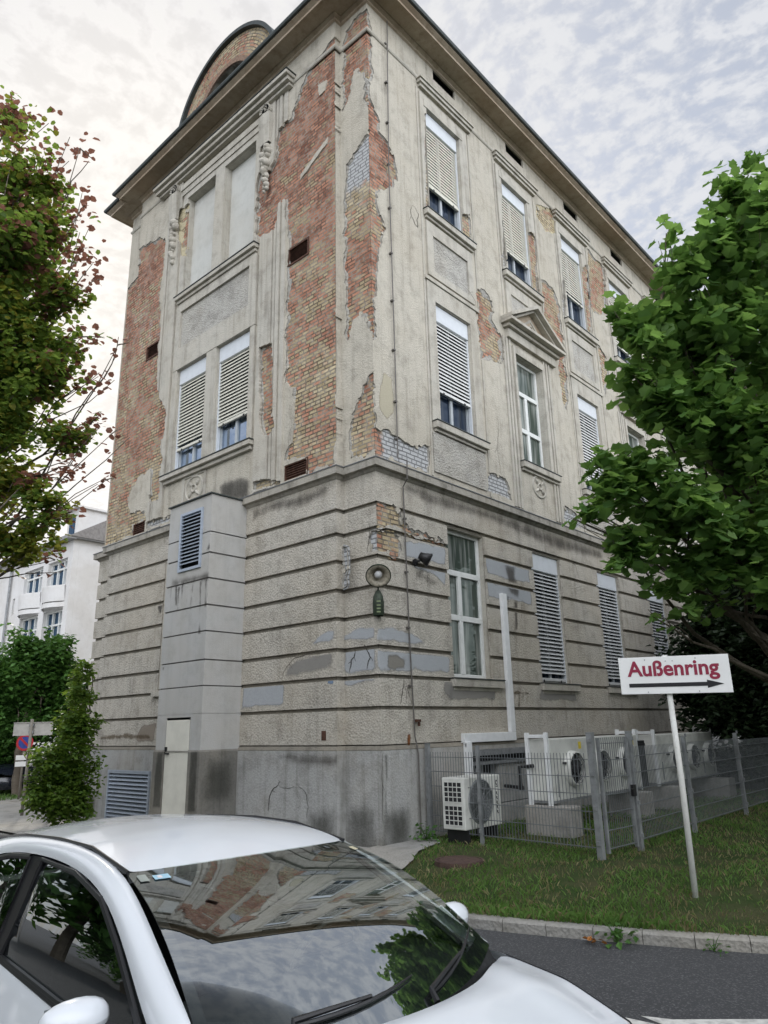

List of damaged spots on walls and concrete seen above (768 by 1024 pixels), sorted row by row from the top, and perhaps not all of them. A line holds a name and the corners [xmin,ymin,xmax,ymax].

peeling [256,9,398,474]
peeling [476,289,504,364]
peeling [528,205,568,409]
peeling [581,249,607,333]
peeling [106,237,170,545]
peeling [349,373,430,473]
peeling [488,473,511,500]
peeling [367,501,444,561]
leakage [188,753,197,811]
leakage [387,816,406,843]